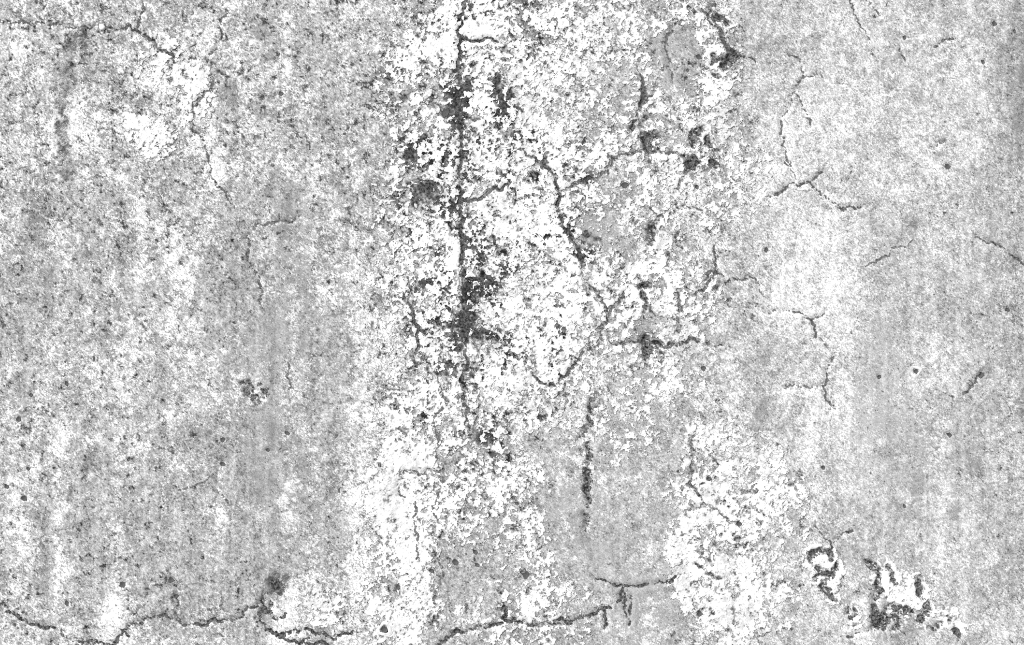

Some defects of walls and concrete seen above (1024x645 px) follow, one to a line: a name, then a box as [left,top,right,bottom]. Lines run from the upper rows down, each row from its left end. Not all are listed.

crack [397,0,714,645]
crack [525,2,836,409]
crack [766,52,861,212]
crack [5,598,361,645]